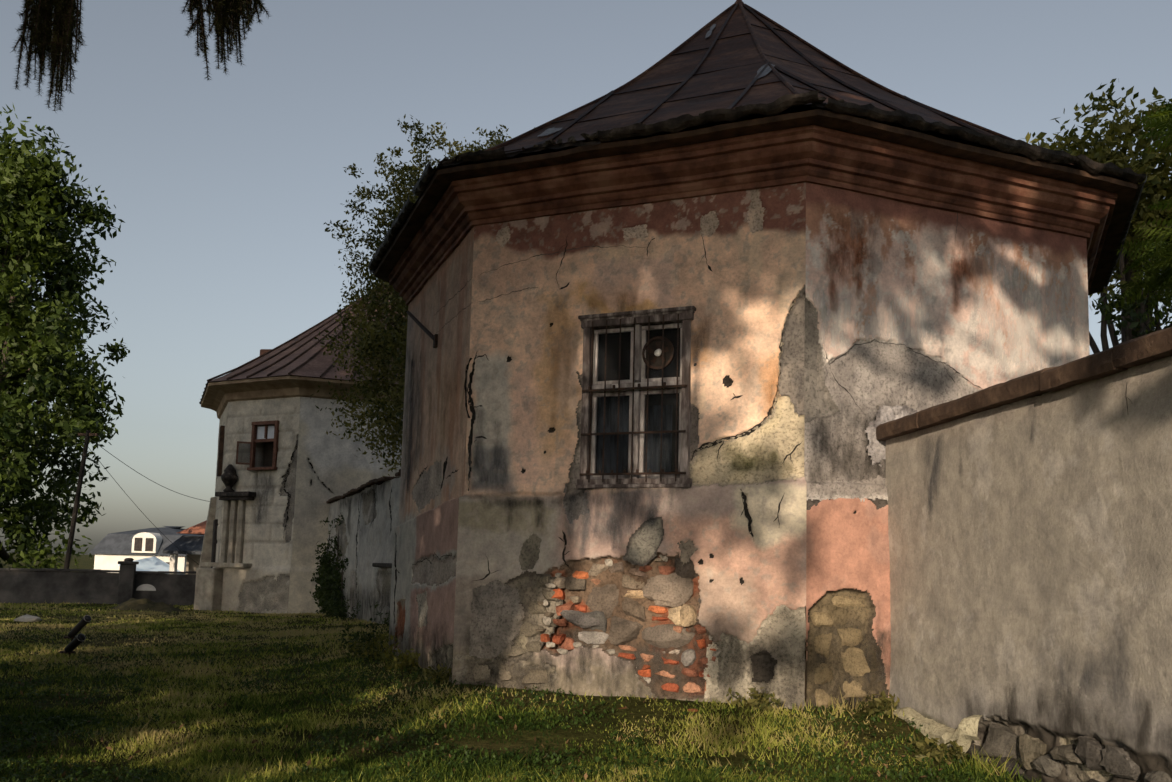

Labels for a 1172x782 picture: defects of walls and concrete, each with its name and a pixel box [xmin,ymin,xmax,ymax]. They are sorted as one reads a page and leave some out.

peeling [622,224,648,241]
peeling [700,211,719,237]
peeling [747,189,766,234]
crack [435,235,655,331]
spalling [778,285,839,423]
crack [389,352,488,624]
crack [740,489,784,540]
flaking render [535,552,721,701]
flaking render [805,588,889,710]